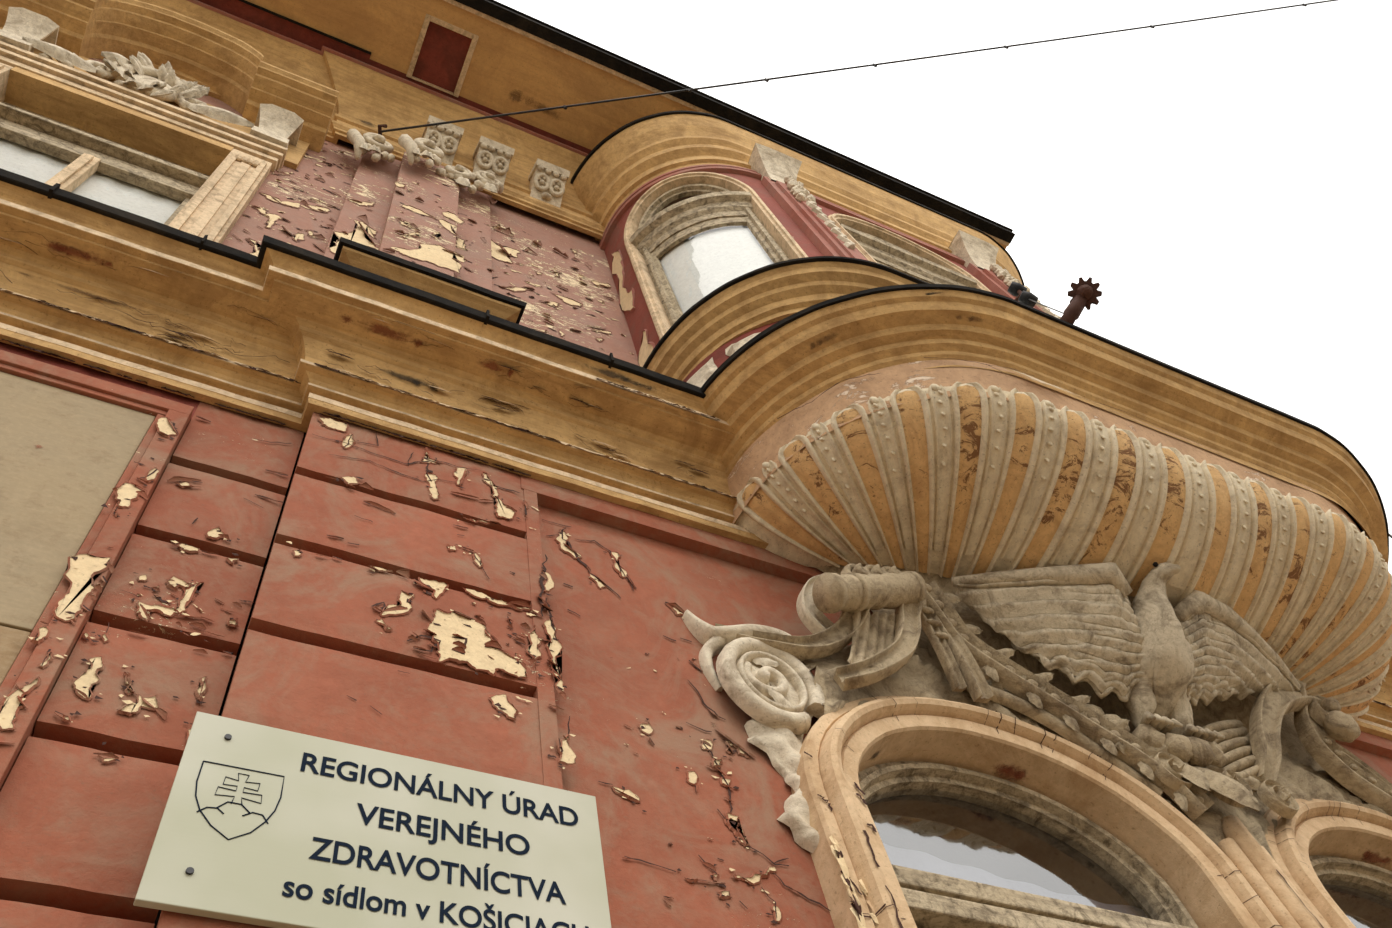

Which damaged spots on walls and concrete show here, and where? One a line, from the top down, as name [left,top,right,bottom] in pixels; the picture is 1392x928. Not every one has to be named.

peeling [233,143,655,367]
peeling [1,339,194,398]
peeling [101,452,203,517]
peeling [155,417,179,440]
peeling [318,412,539,530]
peeling [171,518,242,566]
peeling [0,547,208,743]
peeling [123,569,252,655]
peeling [367,544,577,769]
peeling [598,781,647,812]
peeling [625,712,756,849]
peeling [622,855,732,907]